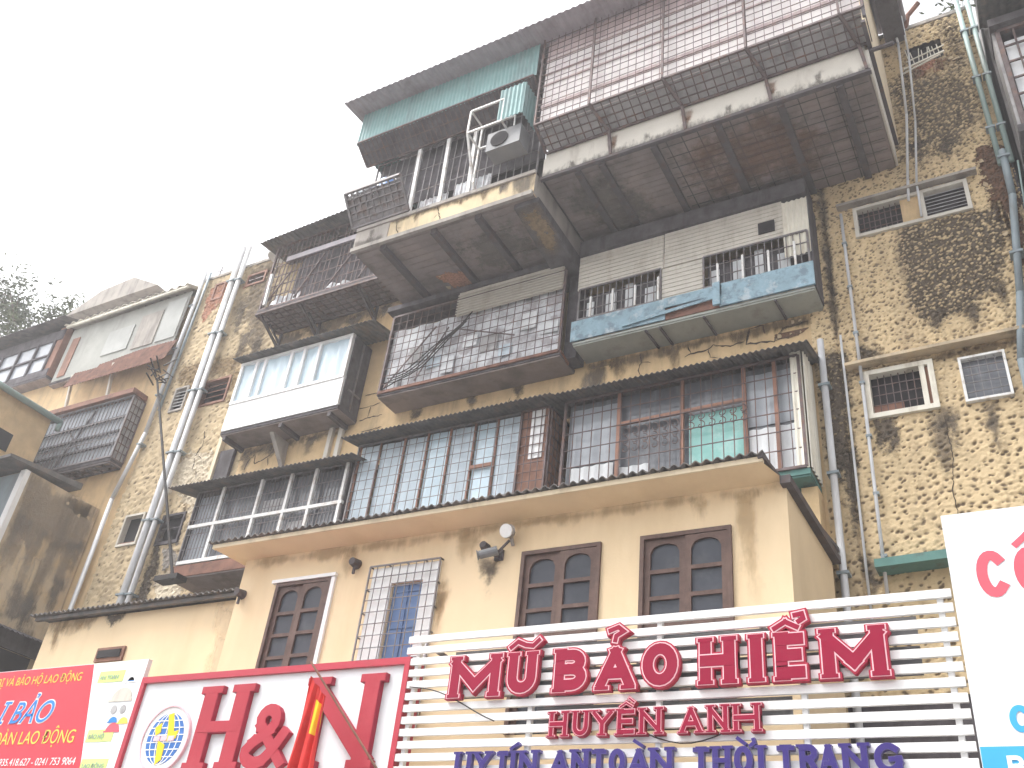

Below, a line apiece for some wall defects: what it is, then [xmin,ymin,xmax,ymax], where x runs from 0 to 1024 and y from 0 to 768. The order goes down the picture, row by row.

water stain [888,21,982,163]
water stain [898,206,1010,328]
crack [685,322,803,358]
crack [944,417,958,510]
water stain [3,545,64,635]
water stain [480,560,497,582]